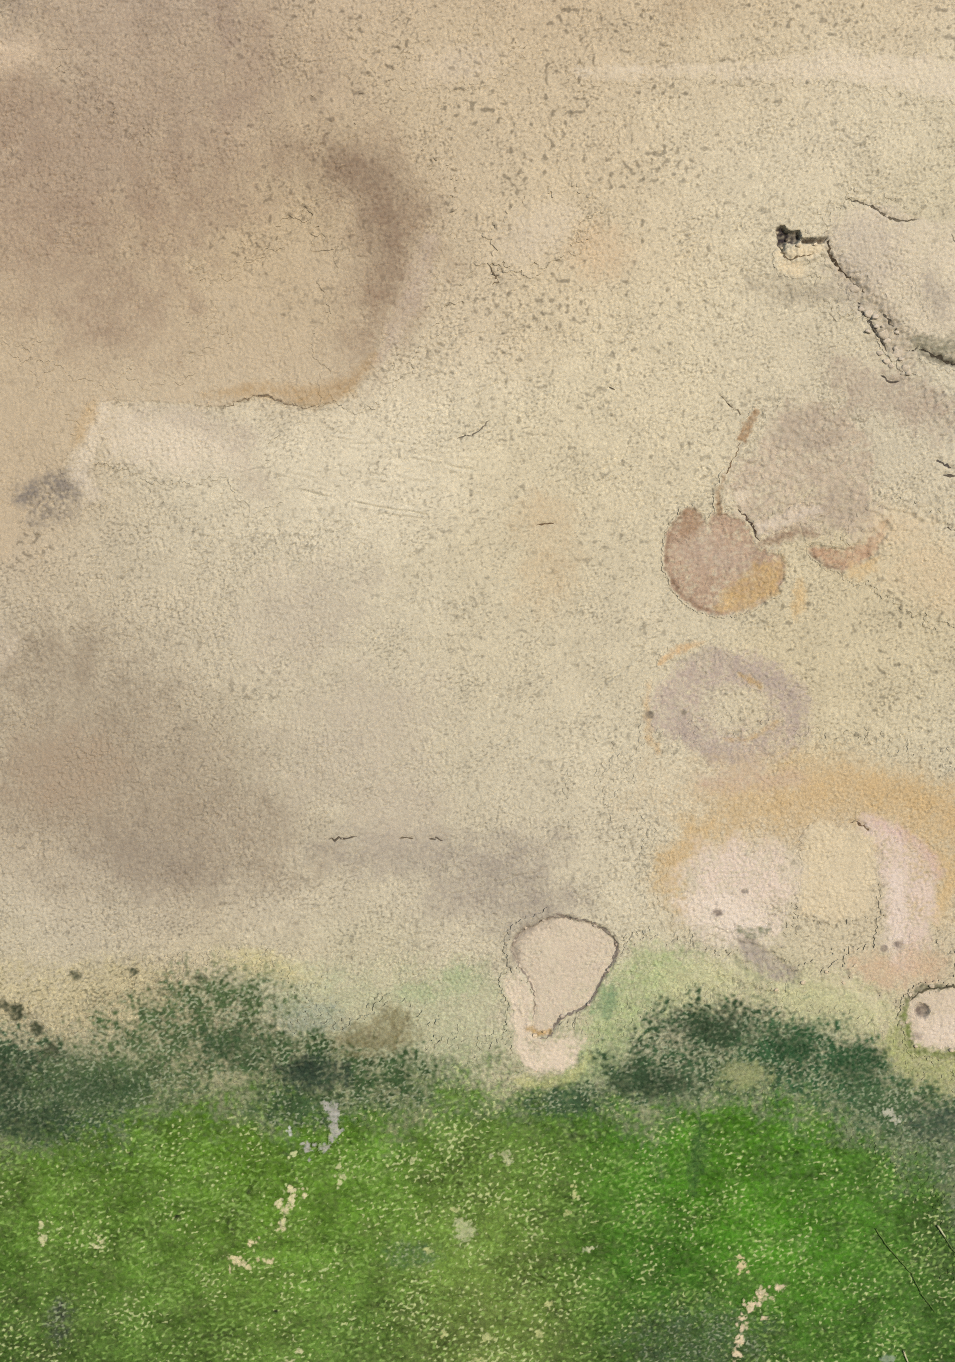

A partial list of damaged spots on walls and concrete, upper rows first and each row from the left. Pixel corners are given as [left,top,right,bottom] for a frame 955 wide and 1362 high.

spalling [714,385,893,553]
flaking render [499,907,620,1095]
spalling [896,980,955,1061]